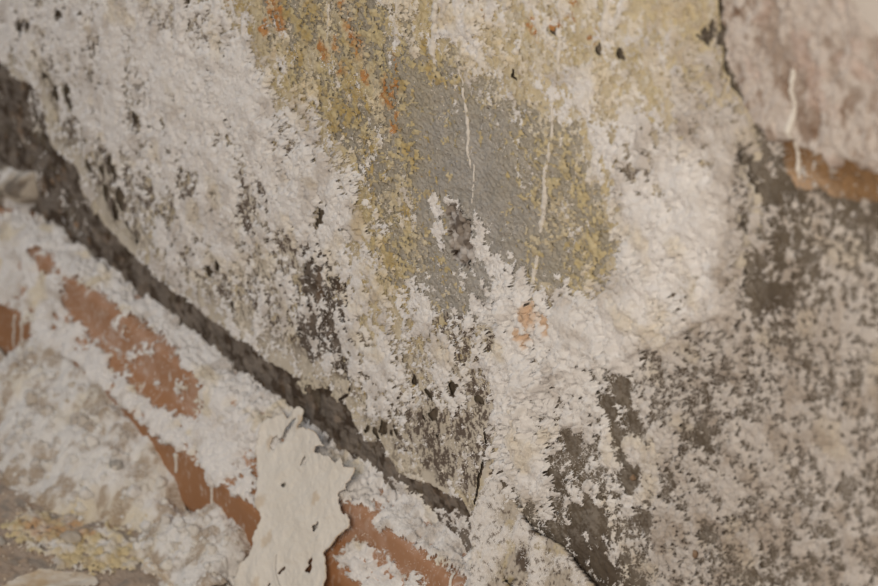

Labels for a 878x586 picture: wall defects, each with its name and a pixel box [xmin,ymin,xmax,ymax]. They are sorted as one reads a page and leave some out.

water stain [76,166,102,214]
peeling [666,0,763,272]
water stain [765,141,790,182]
flaking render [781,141,878,203]
peeling [0,0,678,553]
peeling [667,273,704,334]
water stain [0,188,295,509]
water stain [458,438,480,476]
water stain [0,501,157,578]
water stain [300,418,475,586]